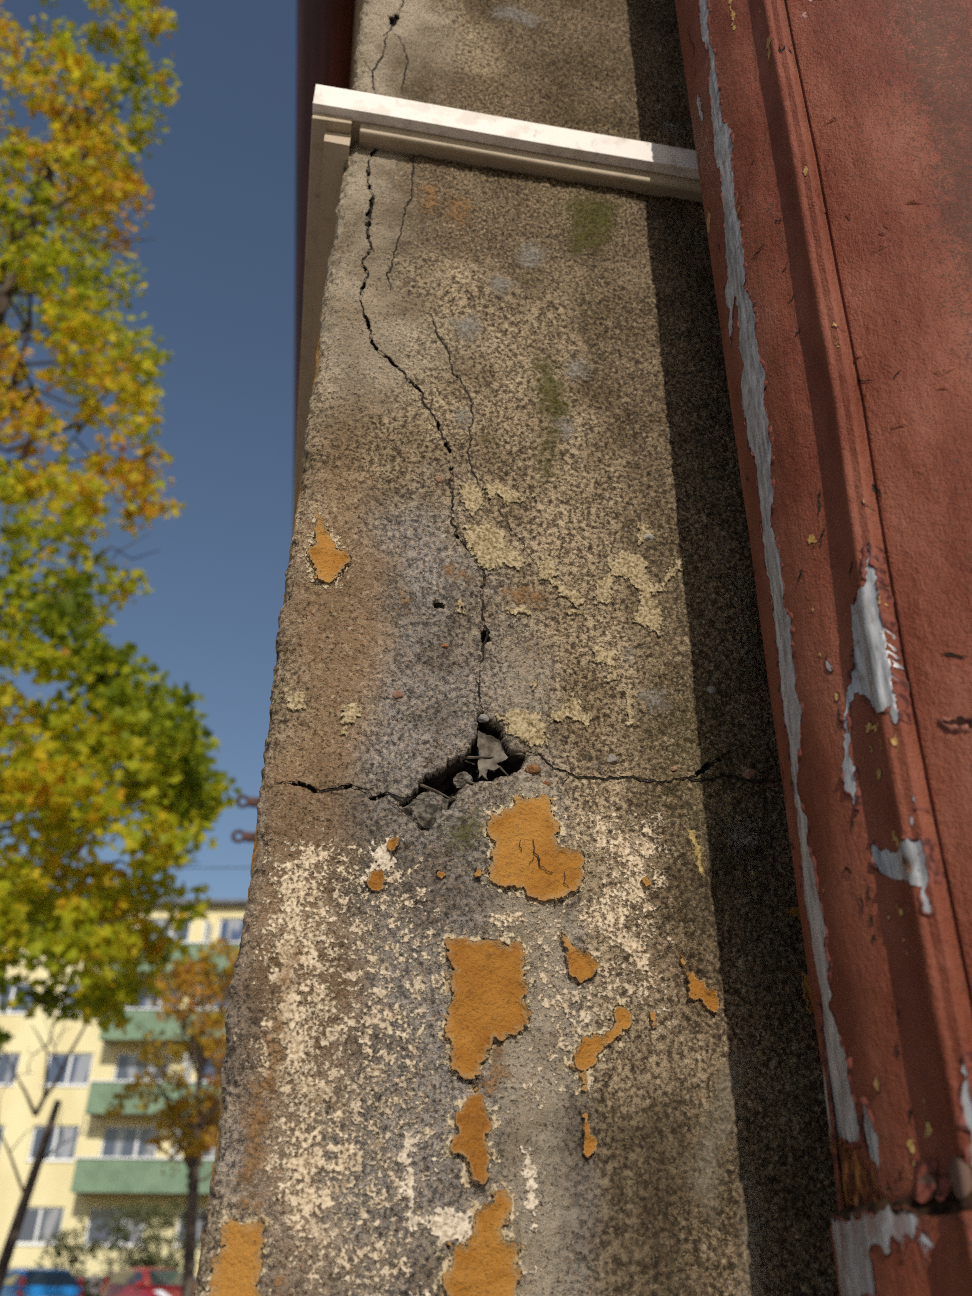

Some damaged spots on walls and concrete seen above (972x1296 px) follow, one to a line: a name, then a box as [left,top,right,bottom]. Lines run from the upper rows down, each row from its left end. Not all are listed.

crack [365,0,409,92]
crack [359,149,534,709]
peeling [697,0,952,1296]
crack [274,781,425,837]
spalling [402,722,525,831]
peeling [473,788,596,912]
crack [527,733,788,867]
peeling [679,950,720,1014]
peeling [431,928,538,1296]
peeling [557,991,657,1160]
peeling [956,1052,972,1170]
peeling [197,1203,280,1296]